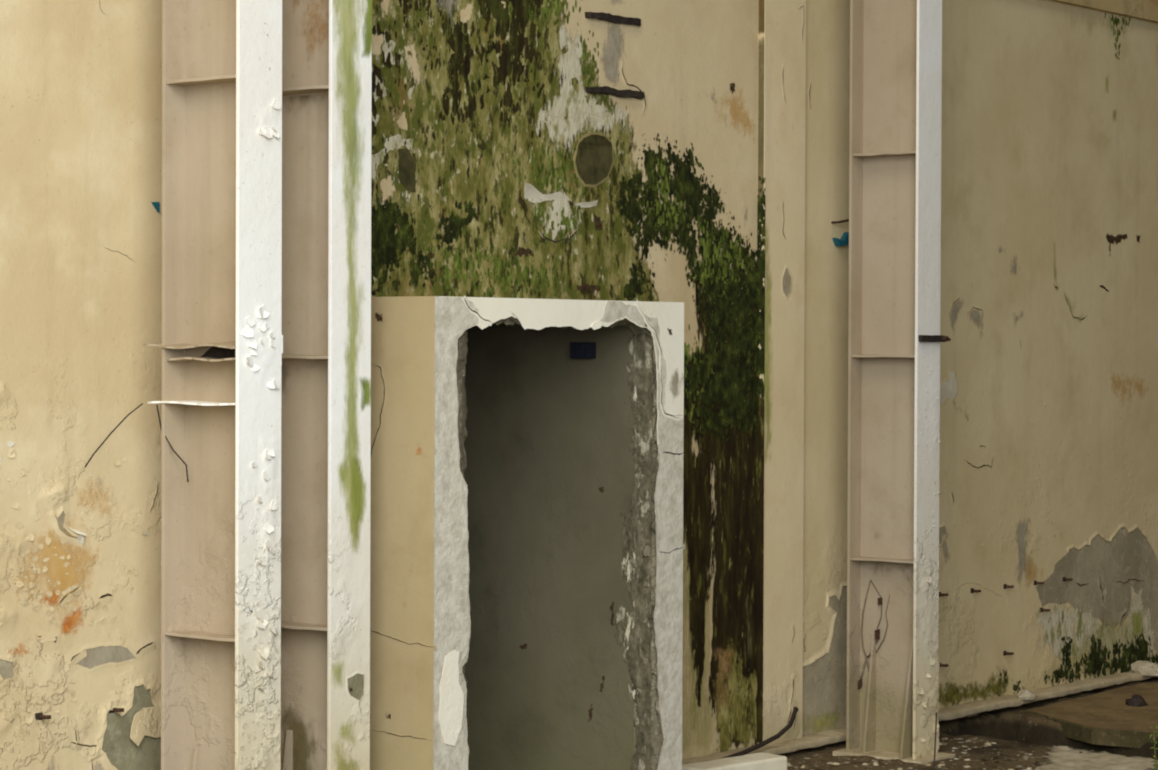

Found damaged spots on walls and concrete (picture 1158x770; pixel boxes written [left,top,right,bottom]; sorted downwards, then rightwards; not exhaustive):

damp [364,0,631,205]
damp [362,380,371,408]
damp [672,0,770,752]
flaking render [0,649,21,690]
peeling [0,441,113,627]
corrosion [37,533,93,603]
corrosion [63,610,81,633]
flaking render [18,635,161,770]
peeling [237,432,281,769]
damp [340,461,363,534]
flaking render [802,581,847,735]
flaking render [1036,522,1158,663]